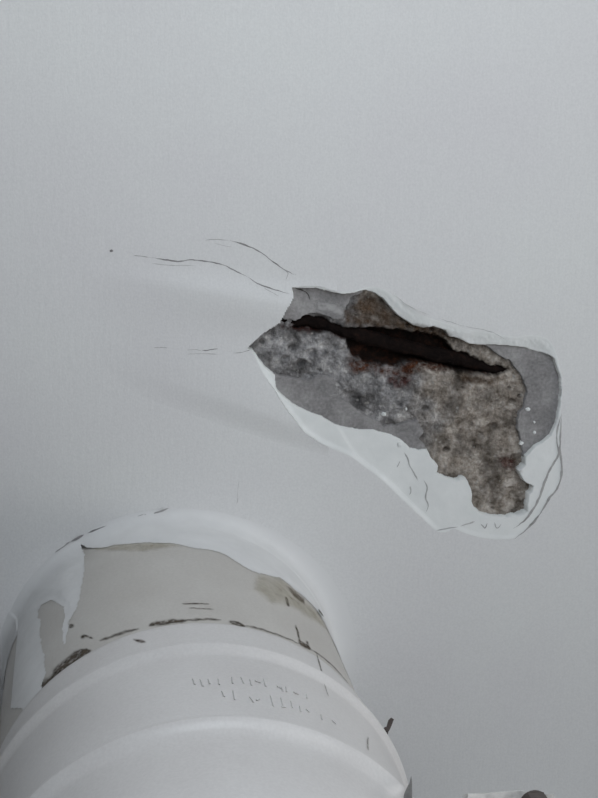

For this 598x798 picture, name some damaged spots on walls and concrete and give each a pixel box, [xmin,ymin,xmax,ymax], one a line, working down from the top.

crack [134,239,310,299]
rust [346,295,450,337]
spalling [248,286,562,539]